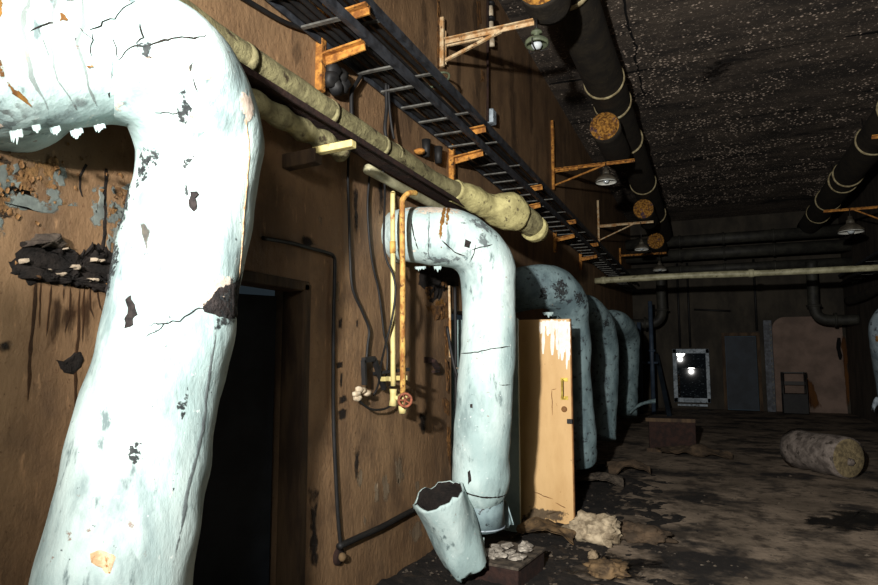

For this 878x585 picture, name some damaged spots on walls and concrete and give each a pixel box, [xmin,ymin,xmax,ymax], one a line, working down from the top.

crack [79,1,206,98]
corrosion [0,60,32,106]
spalling [0,151,130,292]
corrosion [439,207,451,248]
peeling [165,275,233,307]
crack [146,307,206,337]
crack [461,346,509,354]